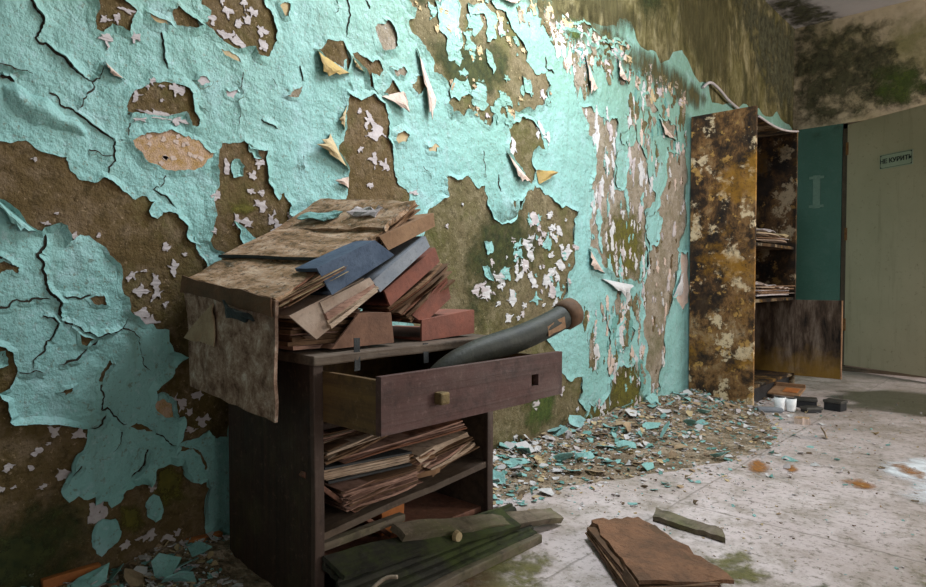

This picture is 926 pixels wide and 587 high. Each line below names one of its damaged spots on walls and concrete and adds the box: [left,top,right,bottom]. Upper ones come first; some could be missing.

crack [0,0,187,215]
peeling [117,72,244,135]
peeling [86,0,294,72]
peeling [282,81,307,101]
damp [528,0,706,107]
damp [682,0,912,124]
peeling [313,0,690,450]
crack [0,233,151,380]
peeling [0,130,301,575]
crack [89,383,127,452]
crack [132,433,176,479]
damp [886,458,926,500]